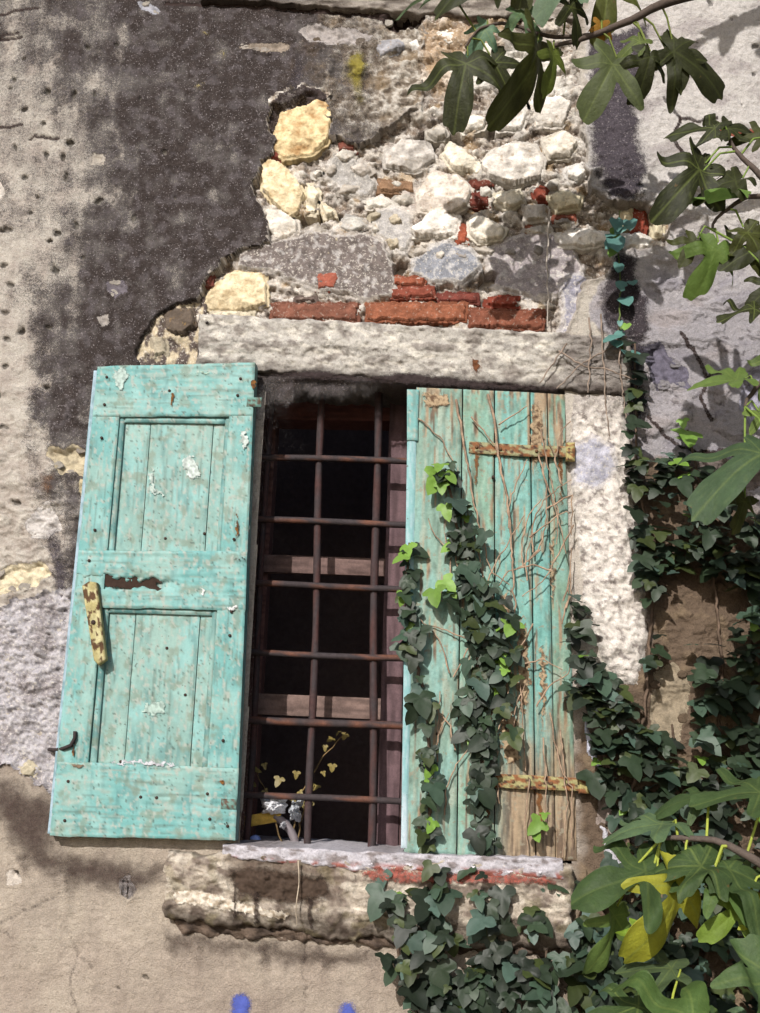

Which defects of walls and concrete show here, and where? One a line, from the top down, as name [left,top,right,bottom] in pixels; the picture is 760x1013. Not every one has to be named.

damp [0,0,382,450]
spalling [137,15,669,375]
peeling [113,367,128,390]
crack [646,415,724,472]
crack [680,331,721,422]
damp [32,465,83,620]
spalling [0,561,72,795]
damp [0,782,164,886]